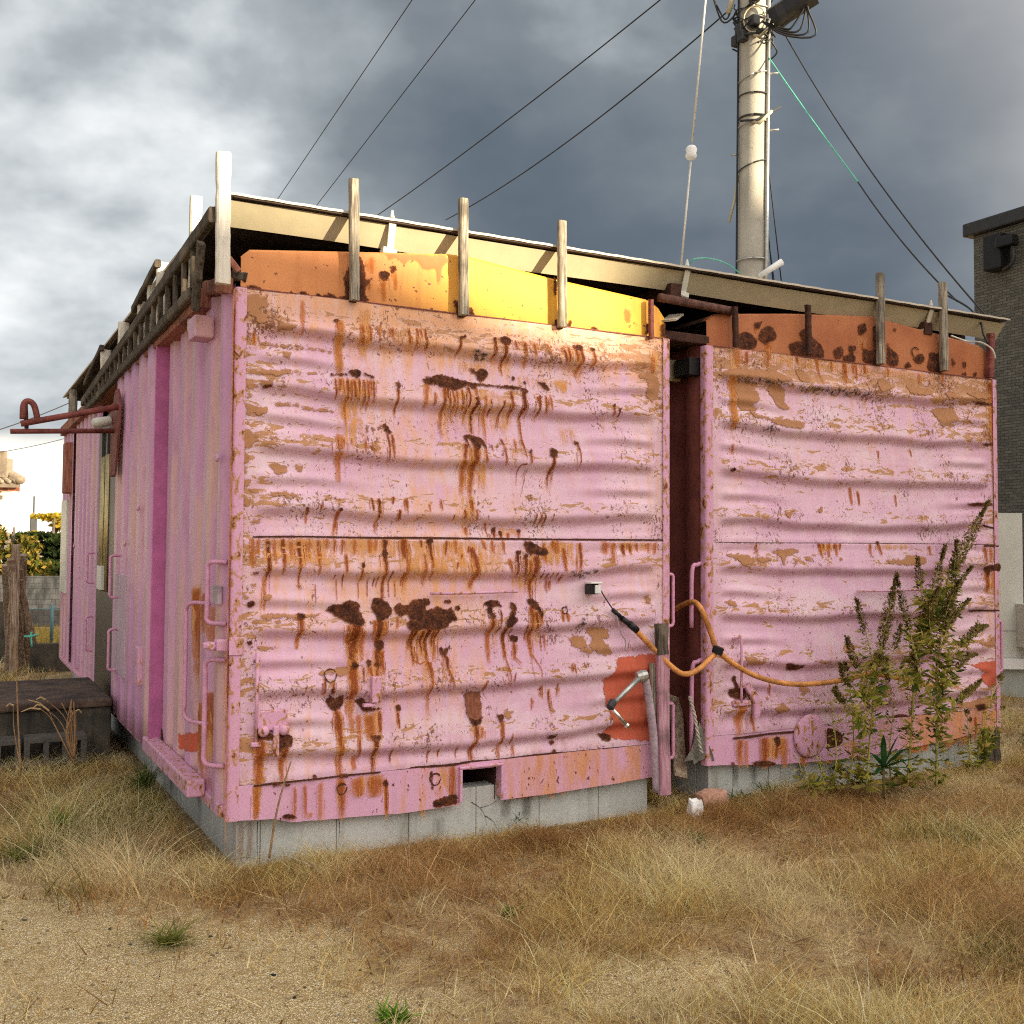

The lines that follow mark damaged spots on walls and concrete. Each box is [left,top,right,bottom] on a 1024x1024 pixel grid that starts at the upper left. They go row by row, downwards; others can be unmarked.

corrosion [290,256,429,356]
corrosion [330,319,402,481]
peeling [719,367,811,429]
corrosion [727,321,977,429]
peeling [907,385,991,427]
corrosion [423,334,598,714]
peeling [726,548,813,567]
corrosion [253,733,293,818]
corrosion [315,571,488,780]
corrosion [496,709,514,759]
peeling [569,627,656,742]
peeling [955,661,997,711]